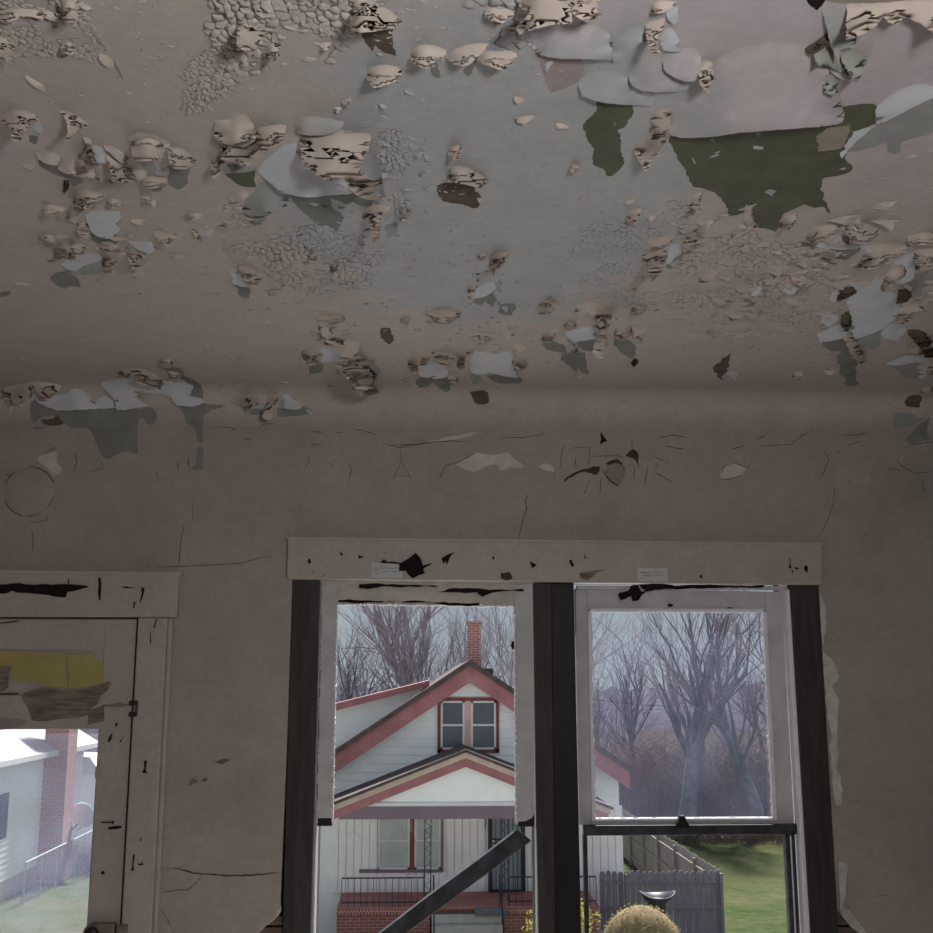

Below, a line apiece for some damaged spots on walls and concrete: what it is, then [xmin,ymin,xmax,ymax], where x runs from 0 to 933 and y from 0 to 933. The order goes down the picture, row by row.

peeling [0,0,933,471]
flaking render [563,449,639,497]
peeling [0,583,89,597]